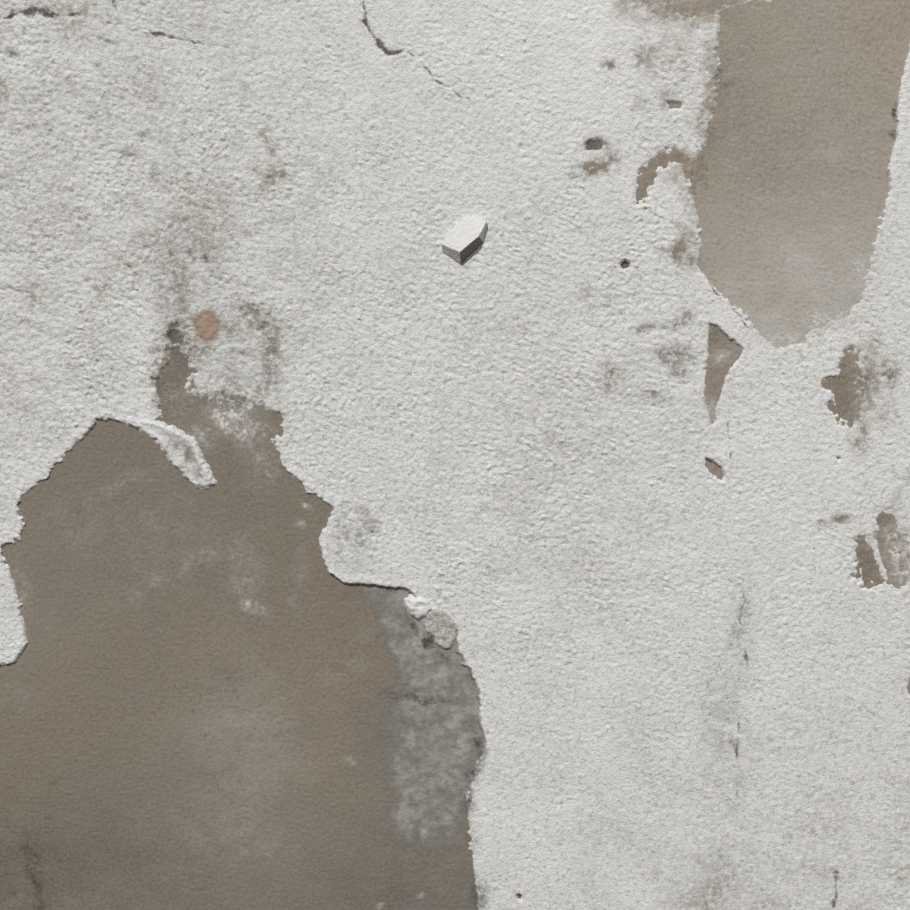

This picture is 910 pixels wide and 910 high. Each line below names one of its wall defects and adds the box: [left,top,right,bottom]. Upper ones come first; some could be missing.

crack [6,7,78,19]
crack [363,6,460,97]
flaking render [620,0,910,348]
spalling [705,324,743,424]
spalling [821,345,876,430]
spalling [850,511,910,589]
flaking render [0,323,486,910]